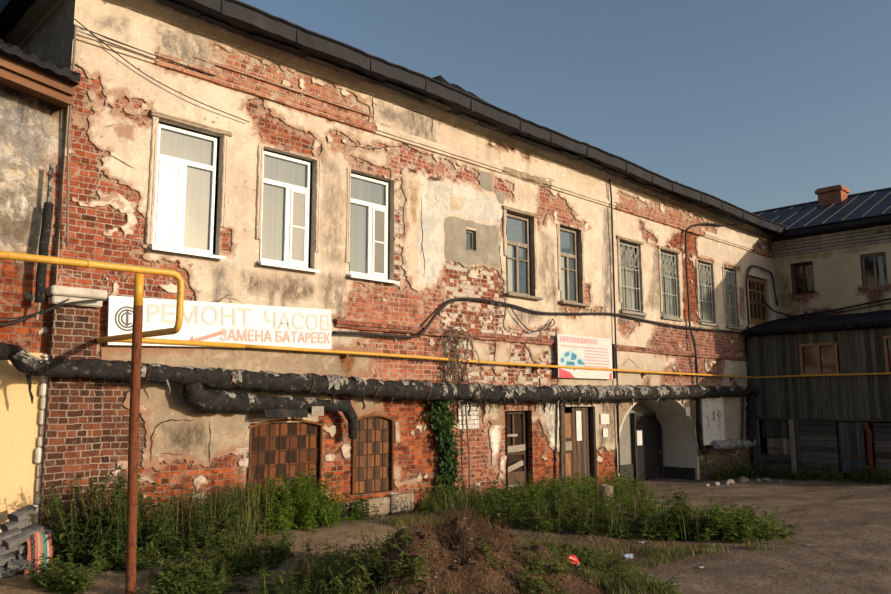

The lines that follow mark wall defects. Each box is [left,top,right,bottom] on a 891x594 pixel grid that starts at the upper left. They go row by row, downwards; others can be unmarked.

spalling [0,44,559,387]
spalling [537,187,587,229]
spalling [618,191,750,387]
crack [150,419,211,461]
flaking render [88,379,275,535]
spalling [203,385,559,512]
spalling [596,401,618,485]
spalling [697,445,754,479]